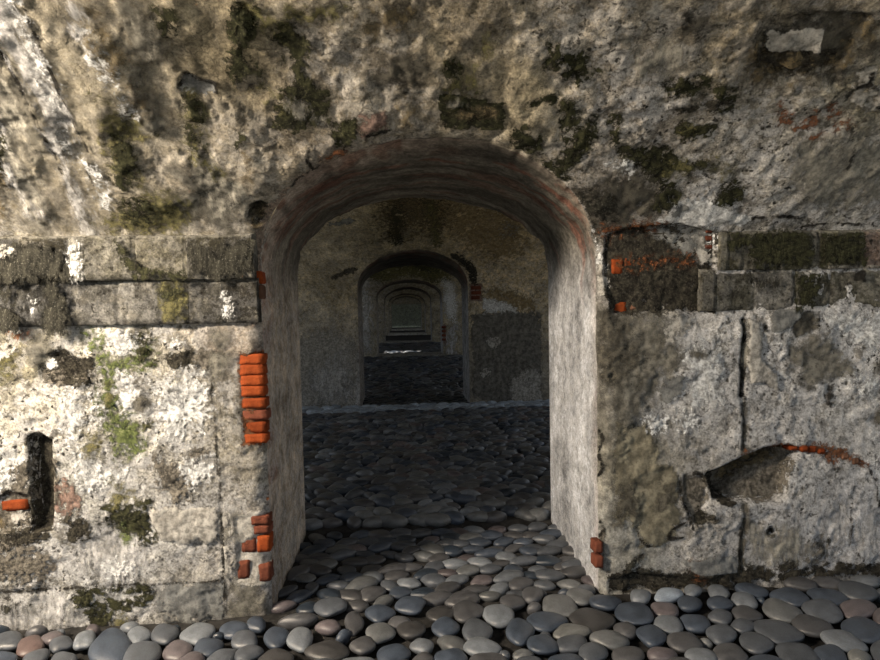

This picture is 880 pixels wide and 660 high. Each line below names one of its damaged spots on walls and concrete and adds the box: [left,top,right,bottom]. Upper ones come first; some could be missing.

crack [0,50,62,174]
water stain [0,0,114,338]
crack [22,7,95,186]
flaking render [590,219,880,594]
crack [739,318,750,451]
water stain [0,449,36,510]
flaking render [0,456,91,591]